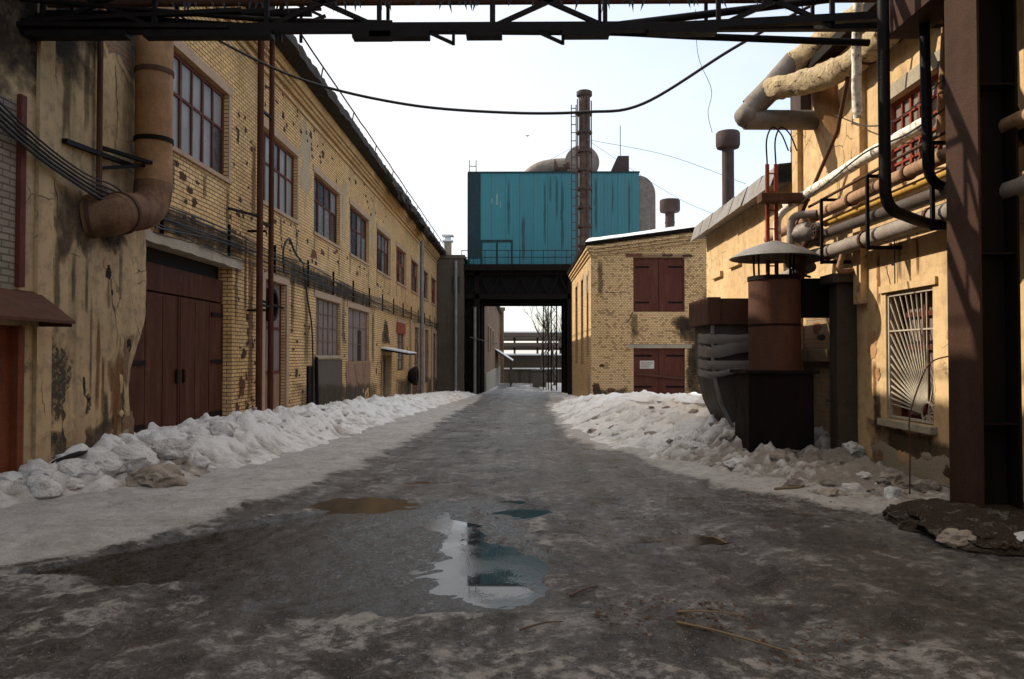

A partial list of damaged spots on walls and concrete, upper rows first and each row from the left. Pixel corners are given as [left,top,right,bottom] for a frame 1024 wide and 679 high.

flaking render [0,94,17,290]
water stain [51,336,72,459]
water stain [83,395,121,448]